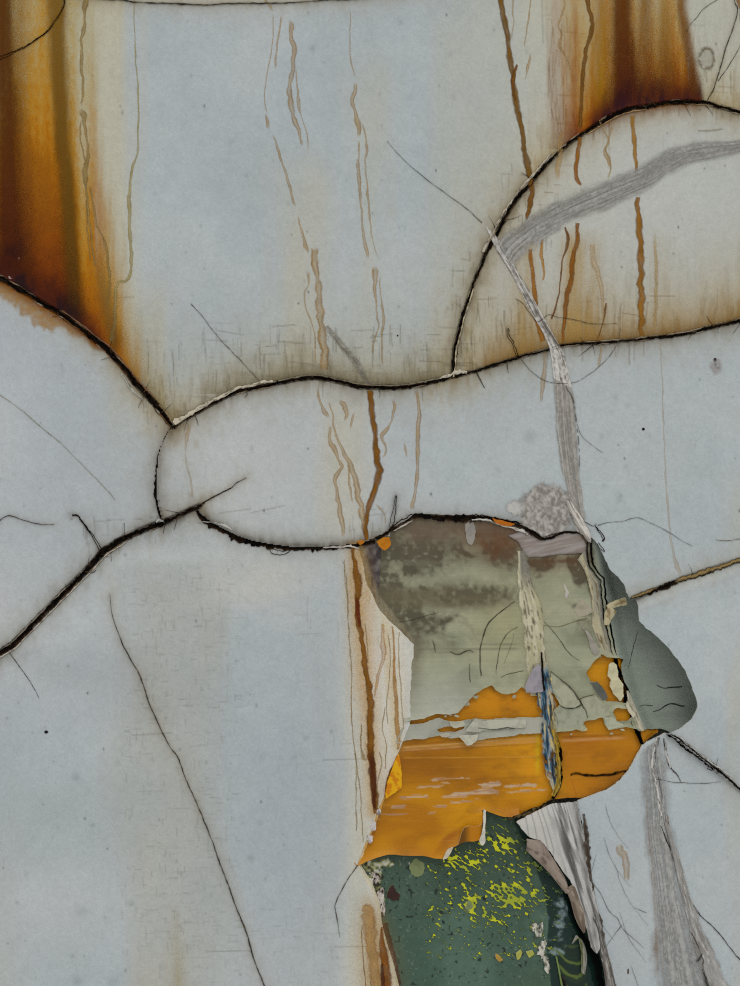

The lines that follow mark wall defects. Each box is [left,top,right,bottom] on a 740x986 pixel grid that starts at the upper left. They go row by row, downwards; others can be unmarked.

corrosion [264,1,308,142]
corrosion [558,0,702,185]
corrosion [0,0,139,382]
corrosion [298,220,328,367]
crack [0,0,740,698]
corrosion [551,223,580,341]
corrosion [635,197,656,336]
corrosion [317,390,396,540]
crack [110,600,265,986]
corrosion [344,548,404,842]
peeling [354,514,697,986]
corrosion [361,905,391,986]